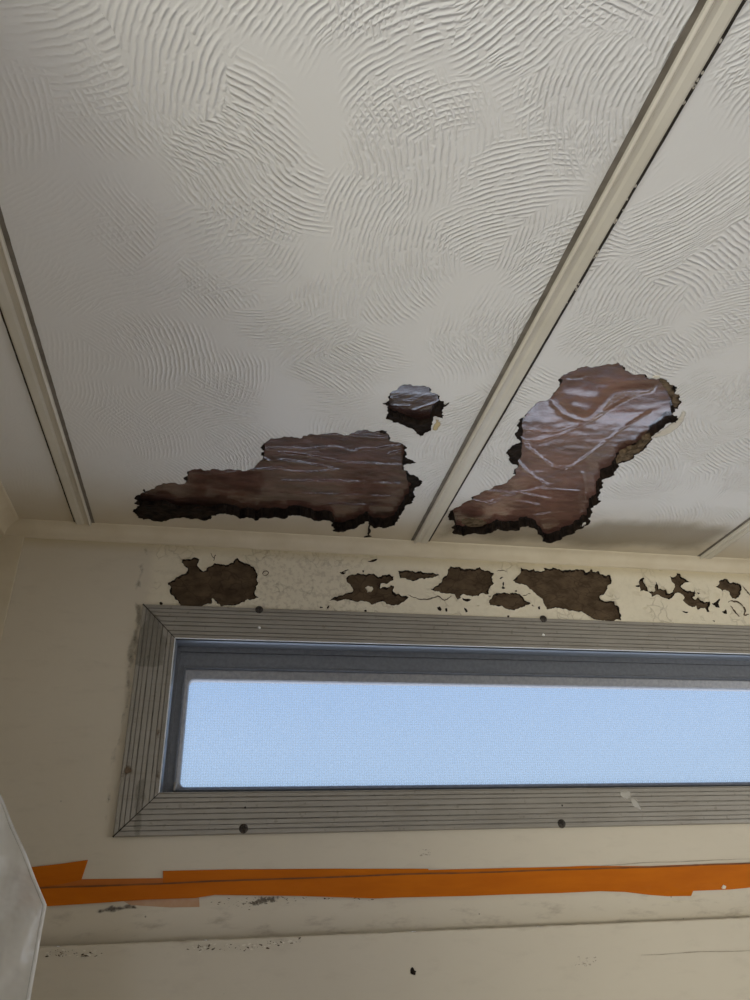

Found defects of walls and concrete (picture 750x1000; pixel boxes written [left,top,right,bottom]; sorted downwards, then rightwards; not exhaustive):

peeling [653,375,681,407]
peeling [388,400,444,434]
peeling [507,418,523,464]
peeling [616,433,652,464]
peeling [403,455,421,503]
peeling [136,500,226,521]
peeling [159,555,261,608]
peeling [320,559,624,621]
peeling [633,571,747,622]